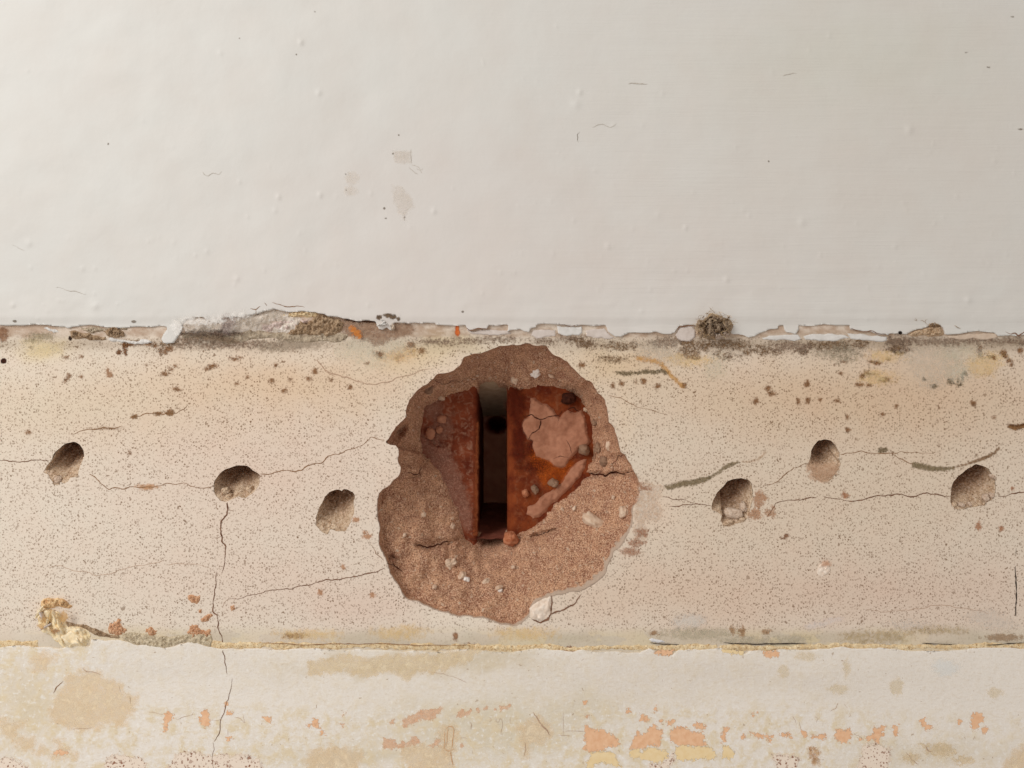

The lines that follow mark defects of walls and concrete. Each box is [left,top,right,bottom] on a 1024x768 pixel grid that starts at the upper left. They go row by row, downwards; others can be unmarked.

leakage [116,339,277,361]
peeling [182,309,348,344]
leakage [341,318,516,364]
leakage [537,335,686,388]
peeling [763,331,902,342]
leakage [648,335,1024,389]
crack [264,437,384,475]
flaking render [377,326,663,627]
crack [764,463,949,517]
crack [840,451,918,464]
crack [53,474,384,768]
peeling [582,700,735,768]